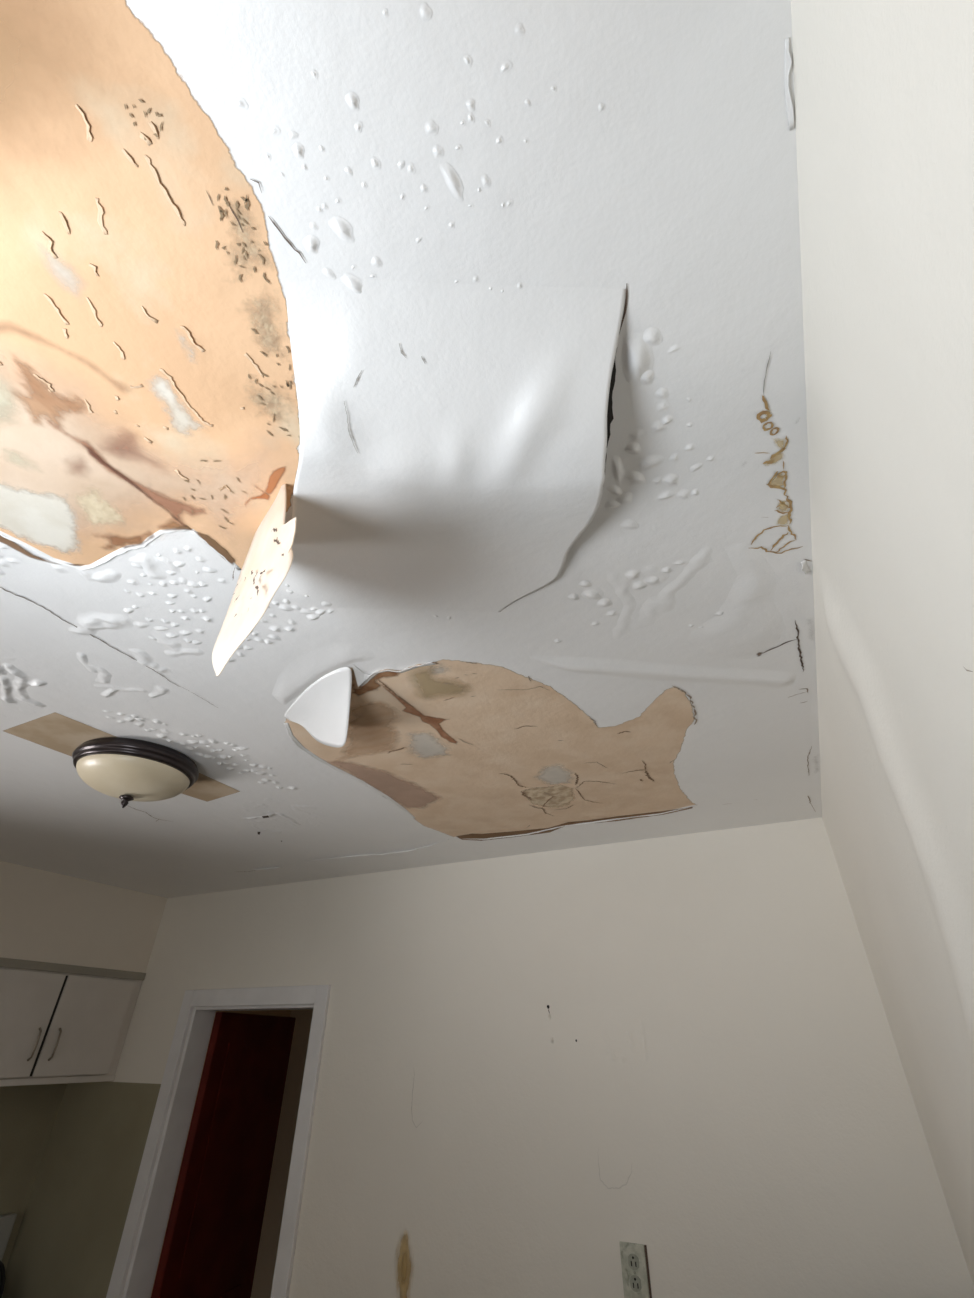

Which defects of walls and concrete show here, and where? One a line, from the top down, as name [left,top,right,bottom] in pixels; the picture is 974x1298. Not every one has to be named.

peeling [75,104,93,142]
peeling [122,99,186,226]
peeling [95,197,108,235]
peeling [215,187,270,284]
peeling [113,368,213,433]
peeling [0,485,122,552]
leakage [398,1235,411,1298]